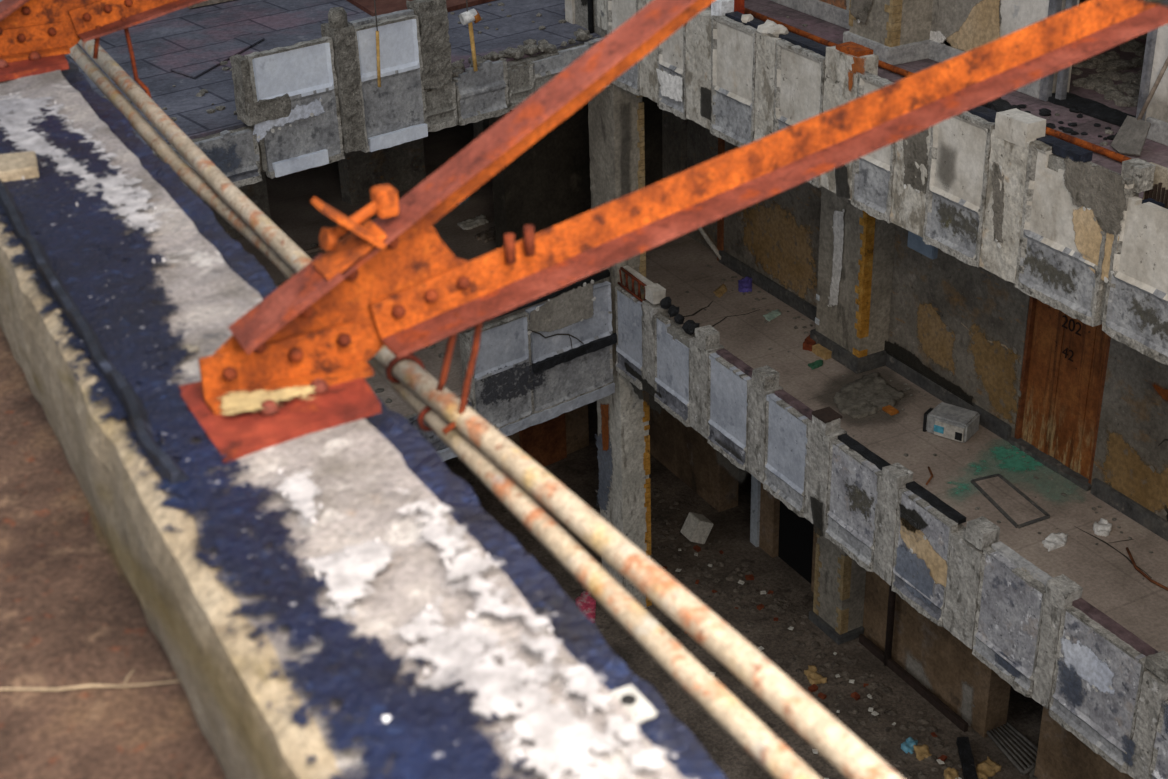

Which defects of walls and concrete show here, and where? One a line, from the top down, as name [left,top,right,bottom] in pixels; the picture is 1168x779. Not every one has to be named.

spalling [820,0,872,24]
rust [848,55,865,91]
spalling [1063,157,1126,283]
damp [1023,246,1077,300]
damp [1123,289,1168,341]
peeling [915,303,1021,429]
rust [600,404,609,451]
peeling [274,468,329,527]
peeling [1103,424,1168,516]
peeling [895,518,948,605]
peeling [303,489,677,779]